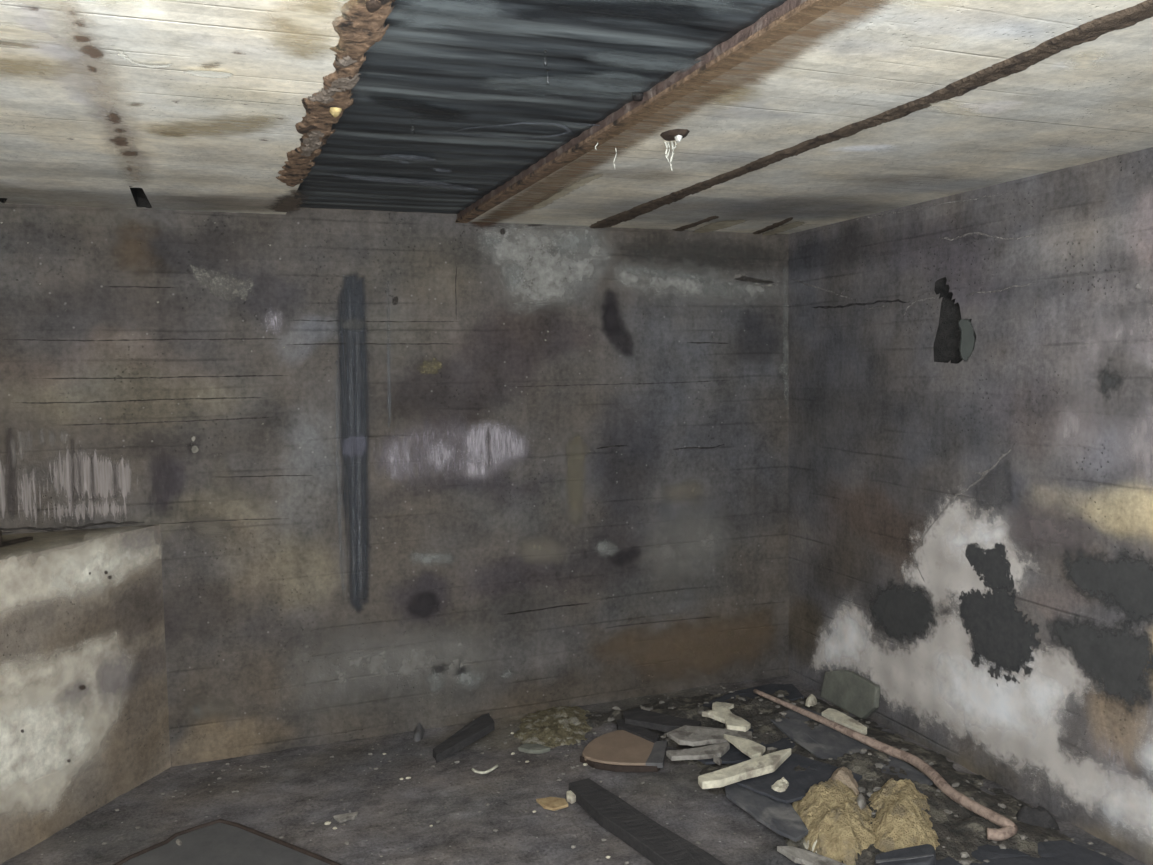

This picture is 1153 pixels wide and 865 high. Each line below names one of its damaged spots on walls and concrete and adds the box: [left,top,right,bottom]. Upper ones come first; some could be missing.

peeling [274,0,338,58]
corrosion [297,99,317,134]
damp [602,292,632,355]
spalling [933,277,976,364]
mould [870,581,937,644]
damp [958,510,1153,712]